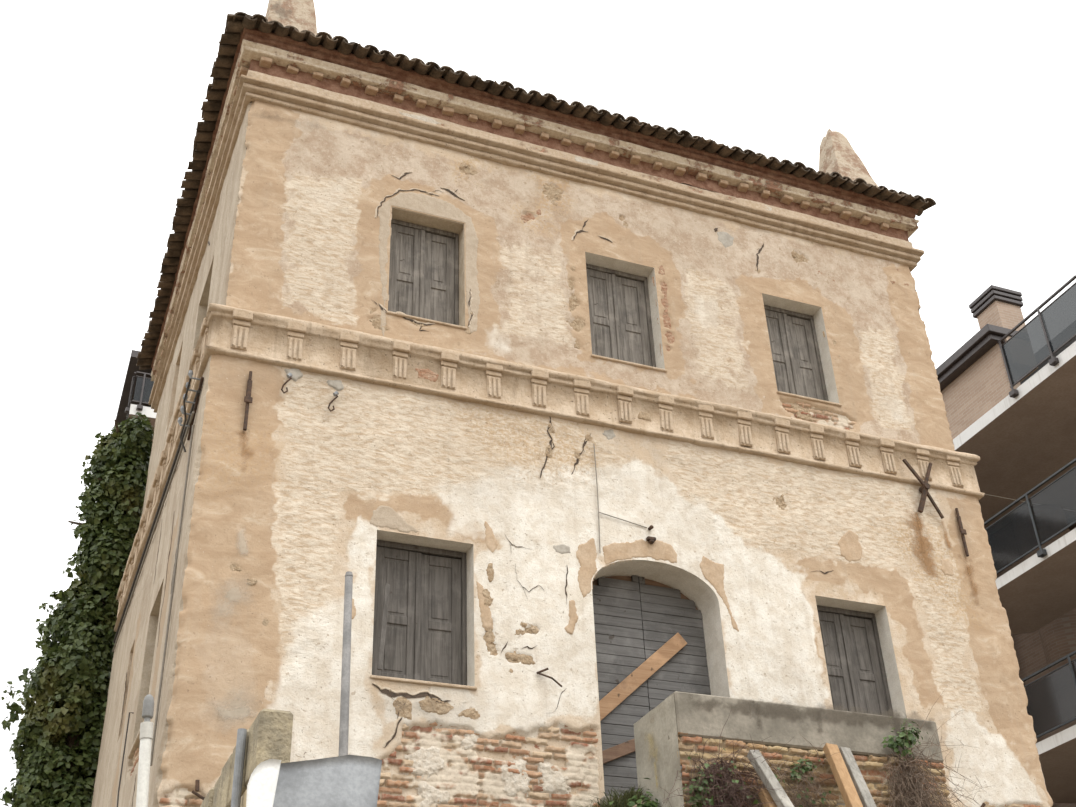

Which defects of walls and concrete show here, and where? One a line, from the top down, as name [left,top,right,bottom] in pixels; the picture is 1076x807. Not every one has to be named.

crack [375,171,465,218]
crack [571,220,613,243]
flaking render [652,265,675,355]
flaking render [782,401,856,430]
crack [540,417,593,478]
flaking render [476,521,535,673]
peeling [564,538,677,635]
peeling [700,556,739,632]
flaking render [515,622,539,635]
flaking render [377,722,600,807]
flaking render [159,788,204,807]